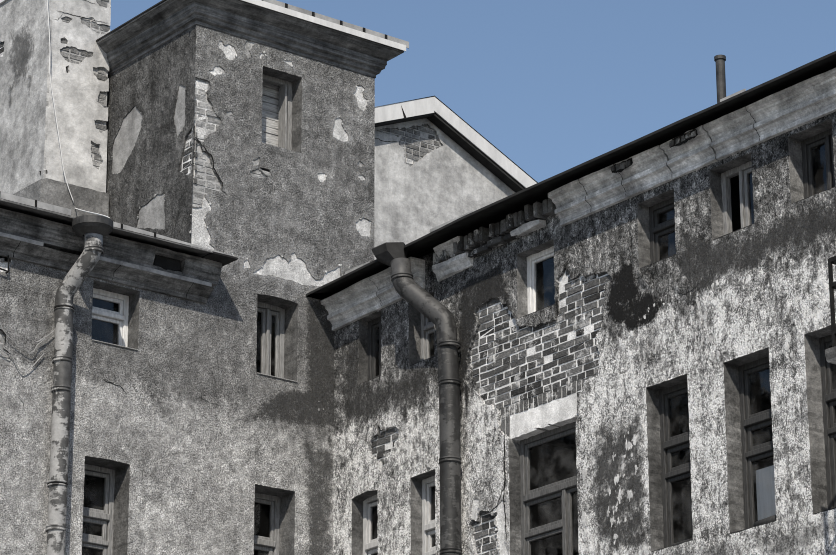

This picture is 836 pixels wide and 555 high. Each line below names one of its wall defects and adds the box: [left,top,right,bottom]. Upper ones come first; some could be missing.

flaking render [60,39,93,64]
peeling [218,40,267,60]
peeling [111,106,143,174]
flaking render [174,66,234,252]
crack [195,136,225,193]
peeling [333,116,348,142]
peeling [243,253,342,287]
water stain [606,263,663,331]
flaking render [468,269,611,444]
flaking render [372,427,399,472]
peeling [602,426,646,555]
flaking render [471,498,512,555]